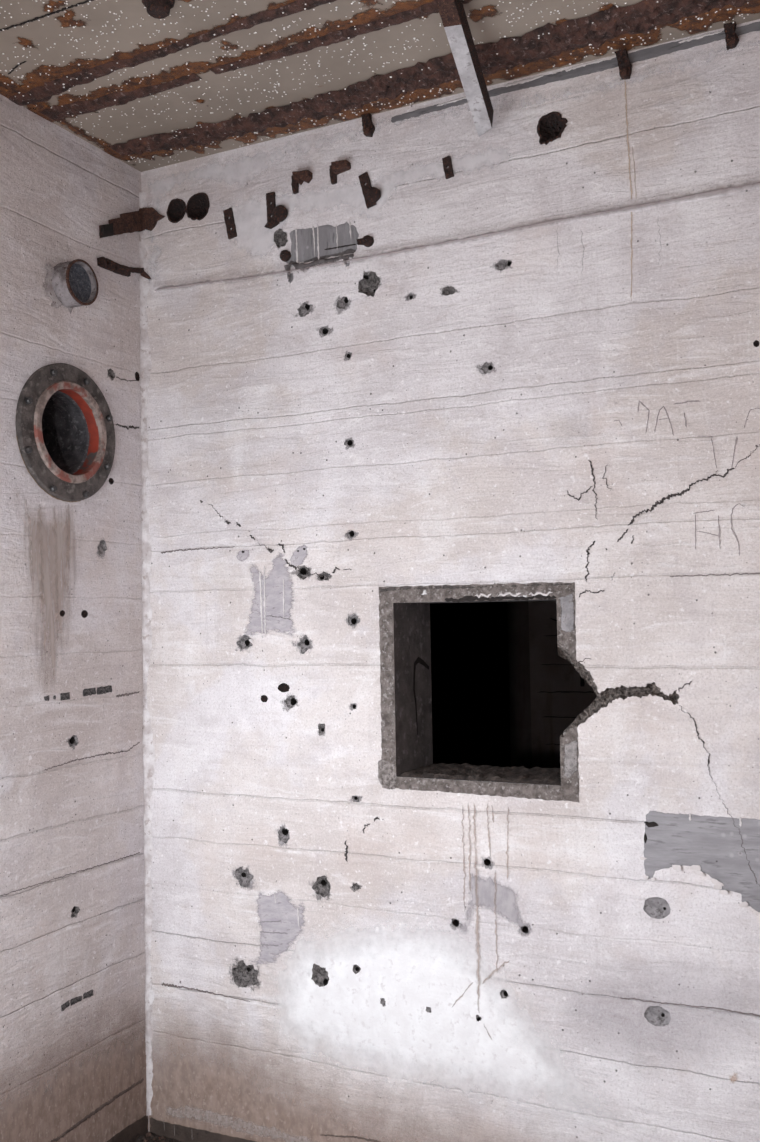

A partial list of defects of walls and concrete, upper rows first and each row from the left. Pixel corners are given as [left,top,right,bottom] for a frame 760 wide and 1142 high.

corrosion [0,0,463,166]
corrosion [460,0,498,22]
corrosion [475,0,760,85]
crack [567,444,760,597]
peeling [236,545,332,654]
crack [678,681,757,884]
peeling [640,811,760,912]
peeling [229,867,305,991]
crack [621,998,760,1017]